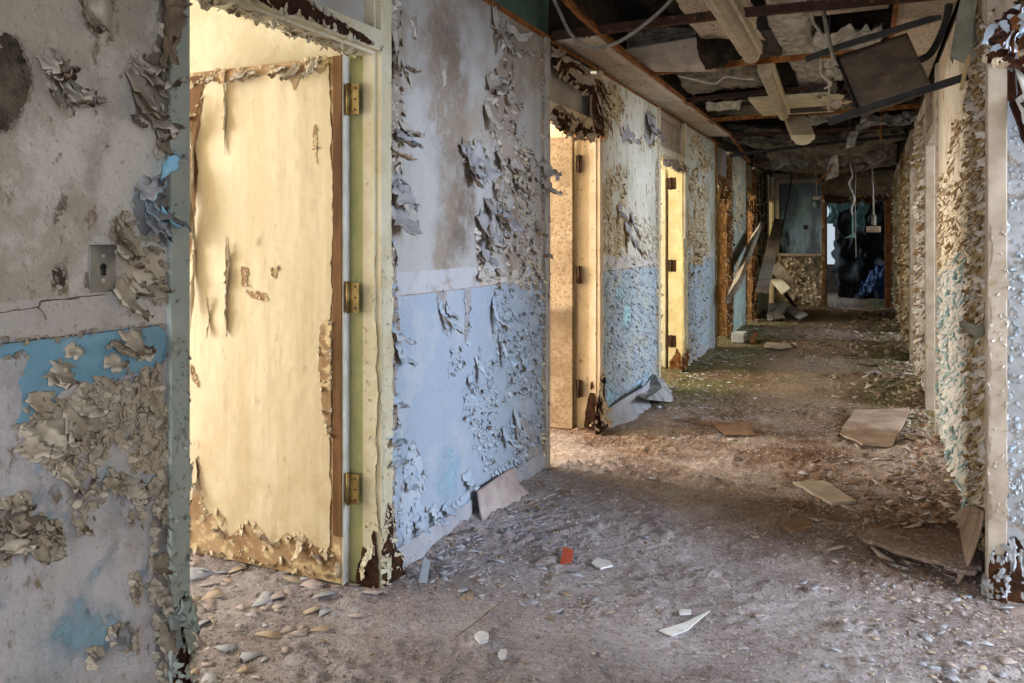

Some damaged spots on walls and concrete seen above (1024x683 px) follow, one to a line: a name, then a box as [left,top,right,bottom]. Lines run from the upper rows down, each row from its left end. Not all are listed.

crack [0,294,158,344]
peeling [0,0,713,683]
corrosion [717,181,736,339]
peeling [778,256,827,307]
peeling [860,0,1024,553]
corrosion [356,502,406,589]
corrosion [983,536,1024,605]